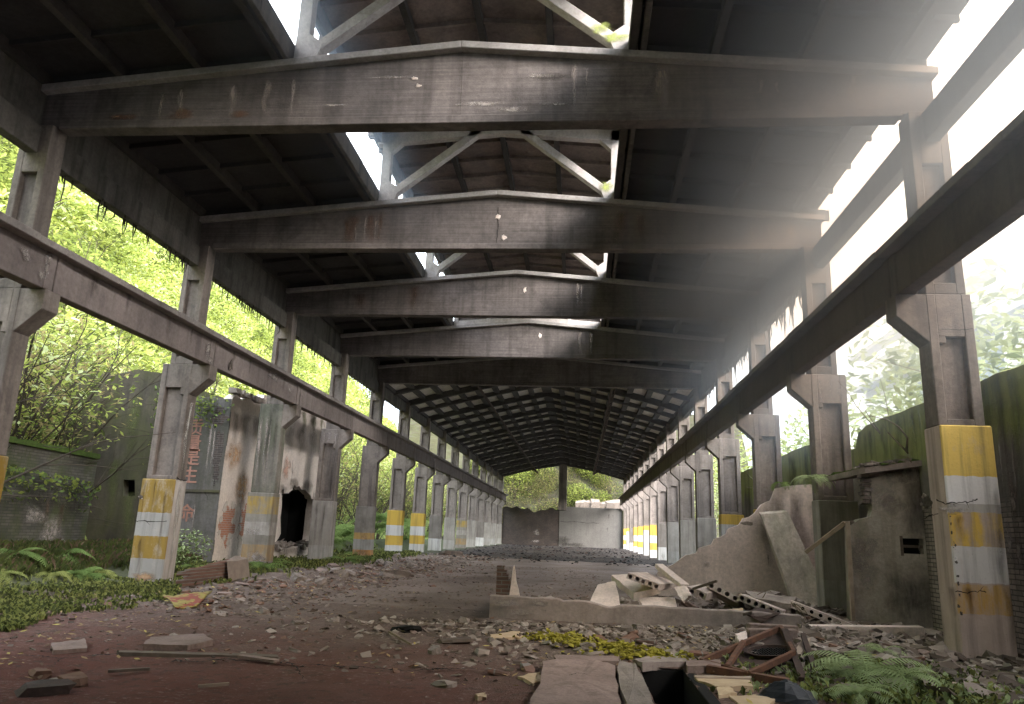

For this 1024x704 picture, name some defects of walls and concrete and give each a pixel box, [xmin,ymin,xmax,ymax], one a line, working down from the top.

spalling [176,476,263,604]
crack [924,499,978,519]